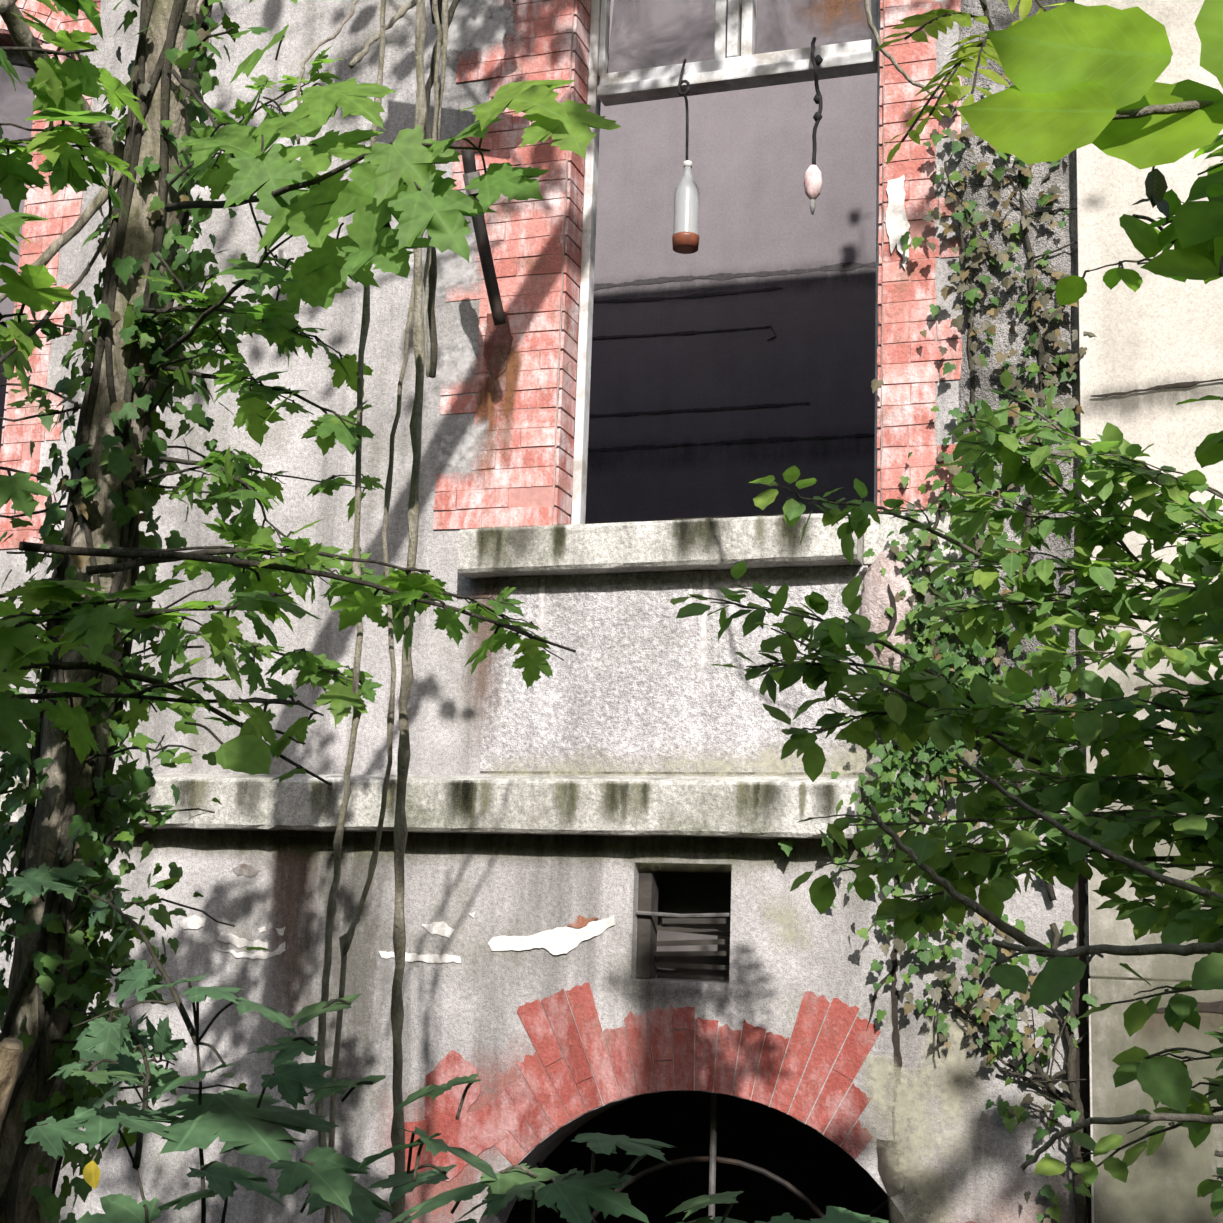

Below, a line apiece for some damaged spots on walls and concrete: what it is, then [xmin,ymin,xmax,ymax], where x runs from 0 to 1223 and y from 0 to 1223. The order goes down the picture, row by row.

peeling [886,175,912,269]
rust [477,311,520,457]
leakage [478,526,532,554]
leakage [448,764,598,817]
leakage [603,771,649,812]
leakage [669,752,804,813]
leakage [800,750,865,814]
leakage [581,835,664,860]
leakage [763,838,807,862]
peeling [421,921,455,938]
peeling [488,915,615,955]
peeling [379,951,461,963]